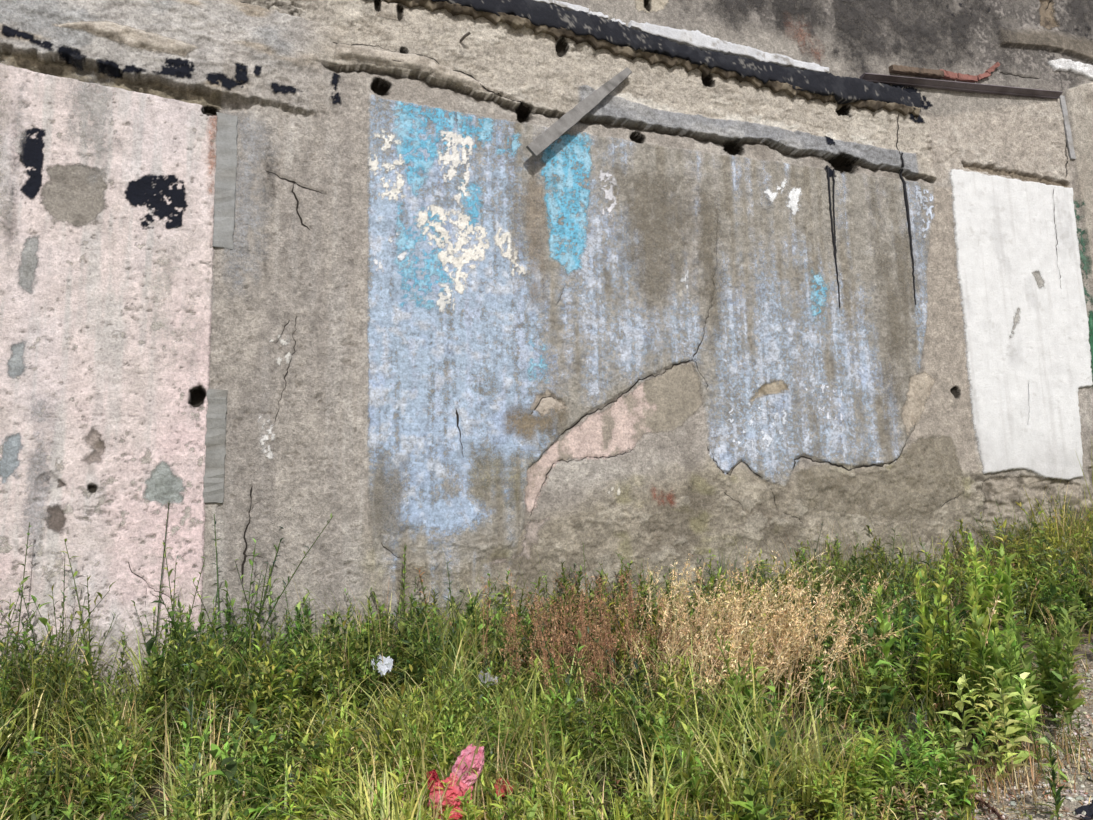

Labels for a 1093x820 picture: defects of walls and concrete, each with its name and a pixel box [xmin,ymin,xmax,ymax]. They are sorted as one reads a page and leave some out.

leakage [719,0,1012,74]
crack [266,170,324,230]
peeling [368,129,410,200]
peeling [415,131,526,313]
crack [275,316,297,421]
flaking render [494,363,704,563]
crack [527,230,718,516]
flaking render [727,379,789,455]
crack [241,487,263,583]